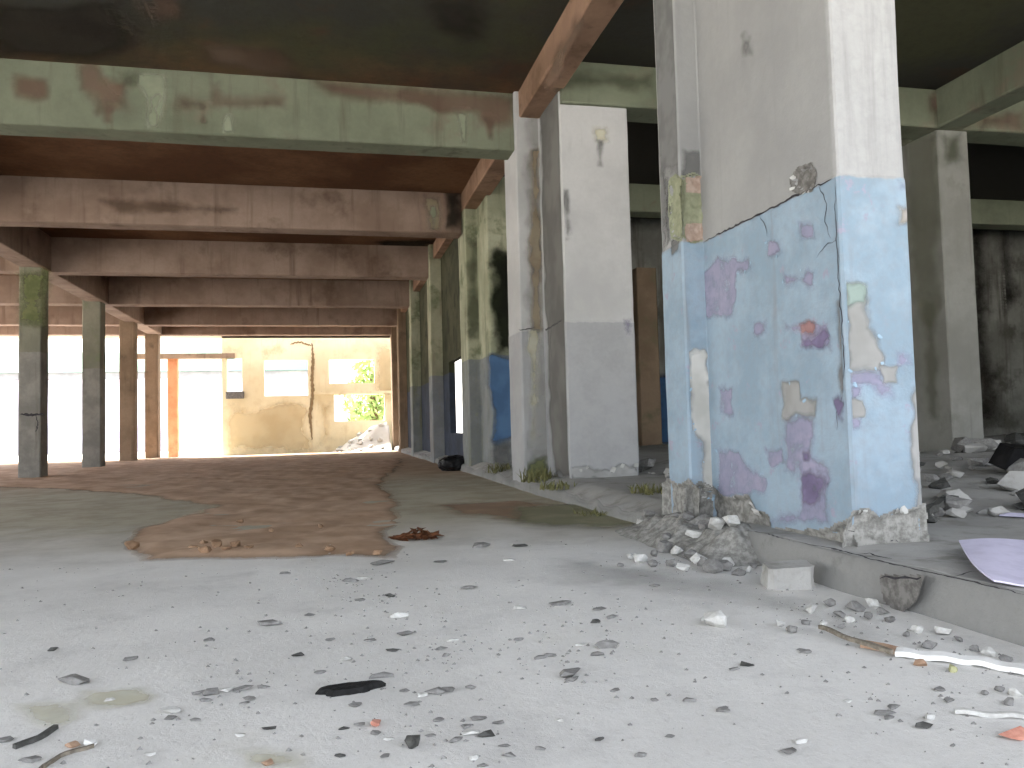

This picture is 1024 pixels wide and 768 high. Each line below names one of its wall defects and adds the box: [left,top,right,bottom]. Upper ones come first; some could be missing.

leakage [126,74,165,126]
mould [467,248,509,351]
crack [703,179,845,426]
crack [20,413,44,431]
crack [290,341,346,440]
spalling [662,349,929,547]
peeling [846,283,898,427]